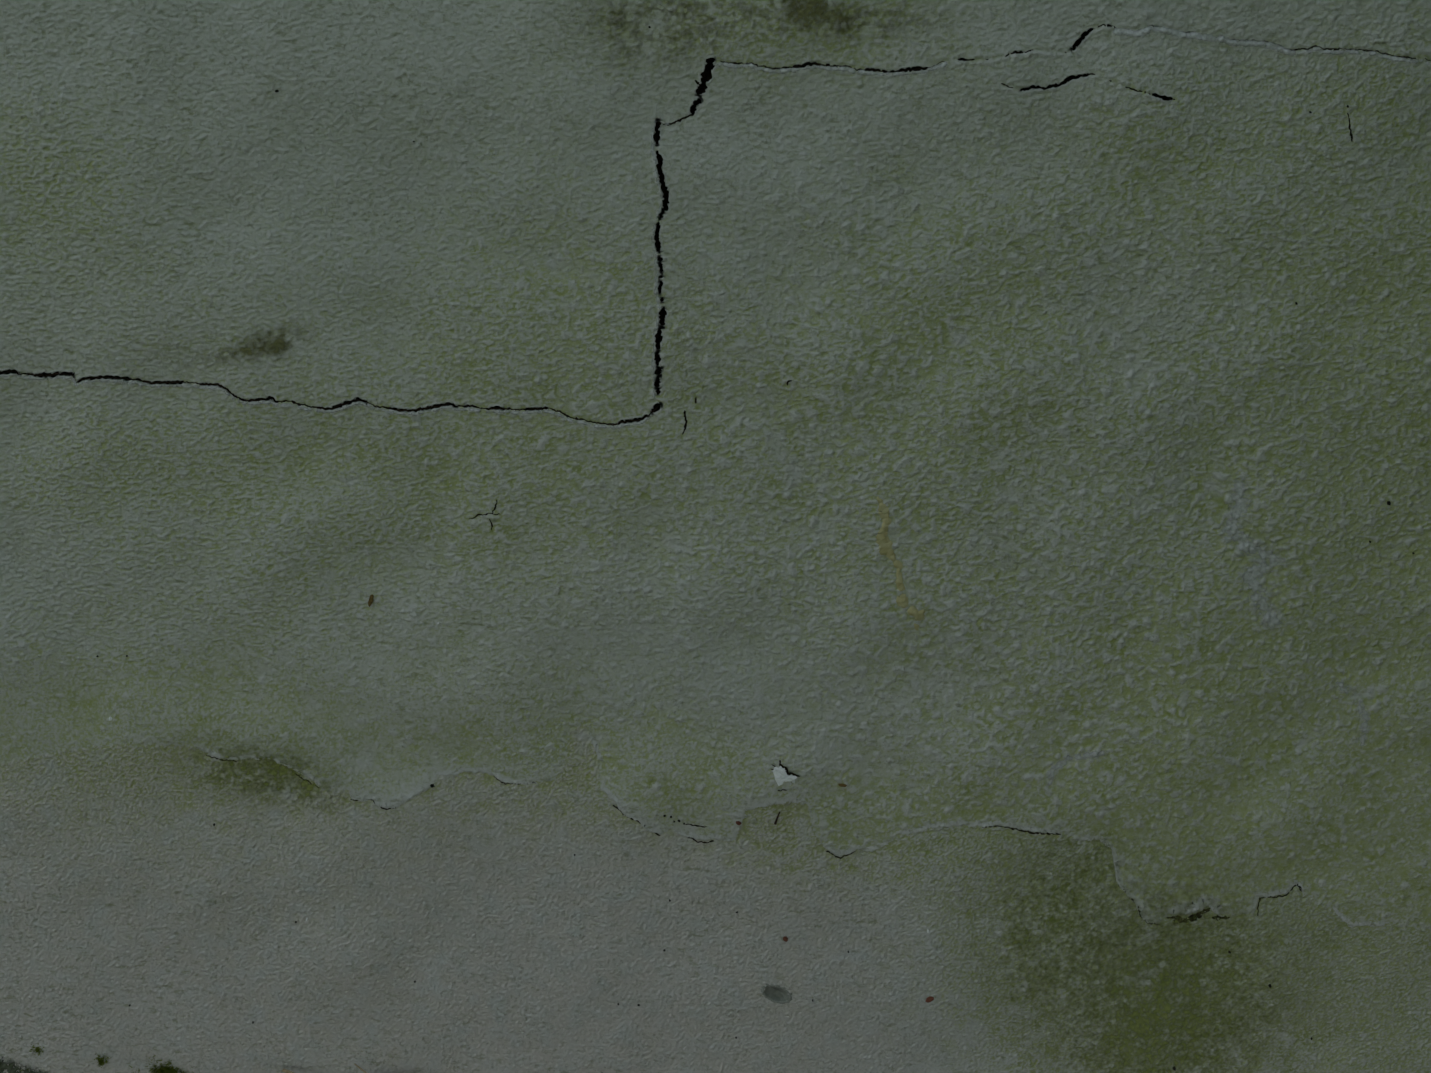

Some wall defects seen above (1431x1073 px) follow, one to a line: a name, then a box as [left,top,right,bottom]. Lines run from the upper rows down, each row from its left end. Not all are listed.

crack [0,22,1431,435]
crack [469,500,499,530]
spalling [745,760,808,811]